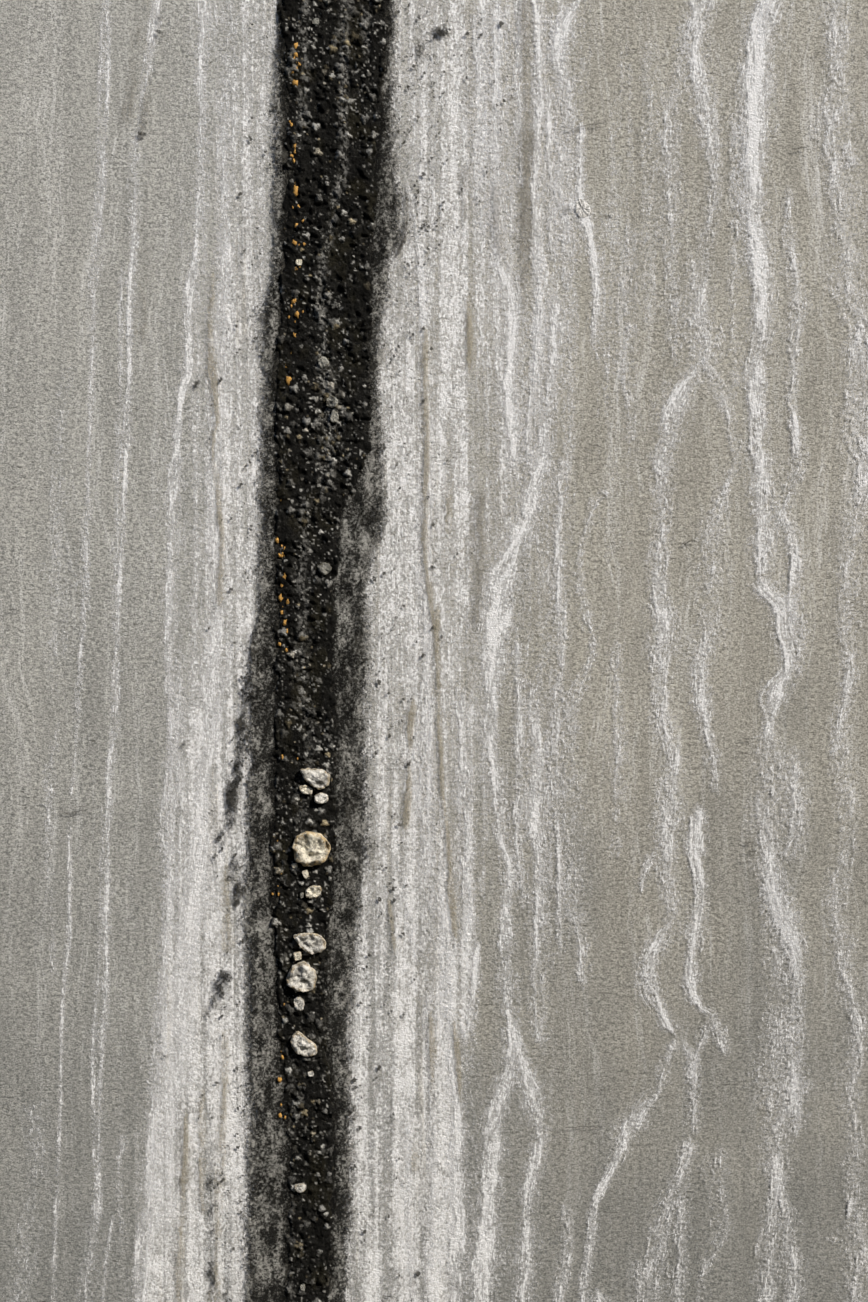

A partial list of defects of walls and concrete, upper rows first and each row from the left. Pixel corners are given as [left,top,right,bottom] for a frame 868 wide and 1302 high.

water stain [12,828,73,1301]
water stain [44,701,81,862]
water stain [47,0,112,685]
water stain [76,122,147,1302]
water stain [123,0,811,1302]
water stain [810,0,868,1302]